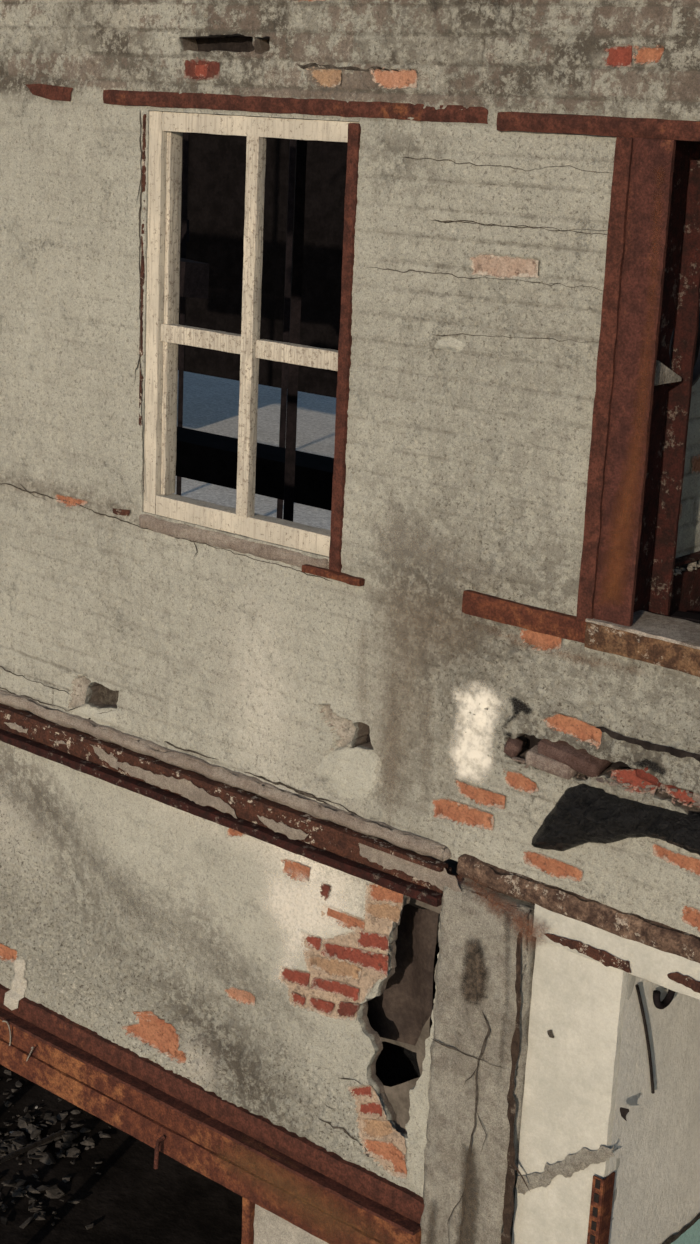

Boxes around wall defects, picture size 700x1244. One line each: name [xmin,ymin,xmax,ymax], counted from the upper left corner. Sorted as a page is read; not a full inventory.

spalling [183,36,255,81]
peeling [91,745,244,837]
peeling [257,815,308,840]
damp [450,685,500,781]
spalling [432,714,700,830]
spalling [278,859,404,1021]
spalling [461,940,488,1005]
spalling [359,843,700,963]
spalling [544,934,631,973]
spalling [667,972,700,993]
spalling [348,1085,407,1179]
crack [431,933,530,1244]